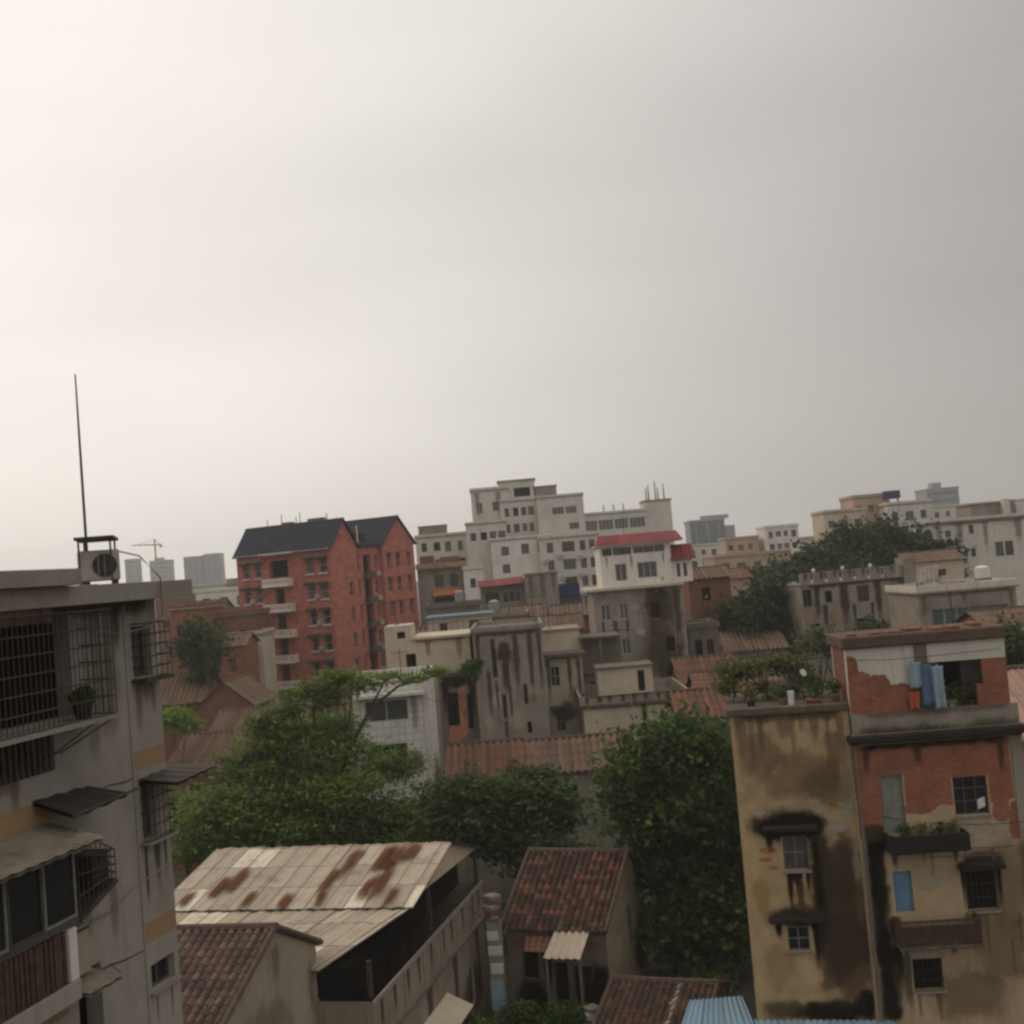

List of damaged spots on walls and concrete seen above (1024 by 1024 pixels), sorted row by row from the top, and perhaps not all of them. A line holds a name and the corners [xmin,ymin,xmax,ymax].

leakage [475,629,669,715]
spalling [846,656,918,715]
spalling [850,737,1020,847]
corrosion [209,868,248,896]
corrosion [278,894,293,908]
corrosion [315,850,364,906]
corrosion [358,844,420,904]
leakage [754,810,912,1021]